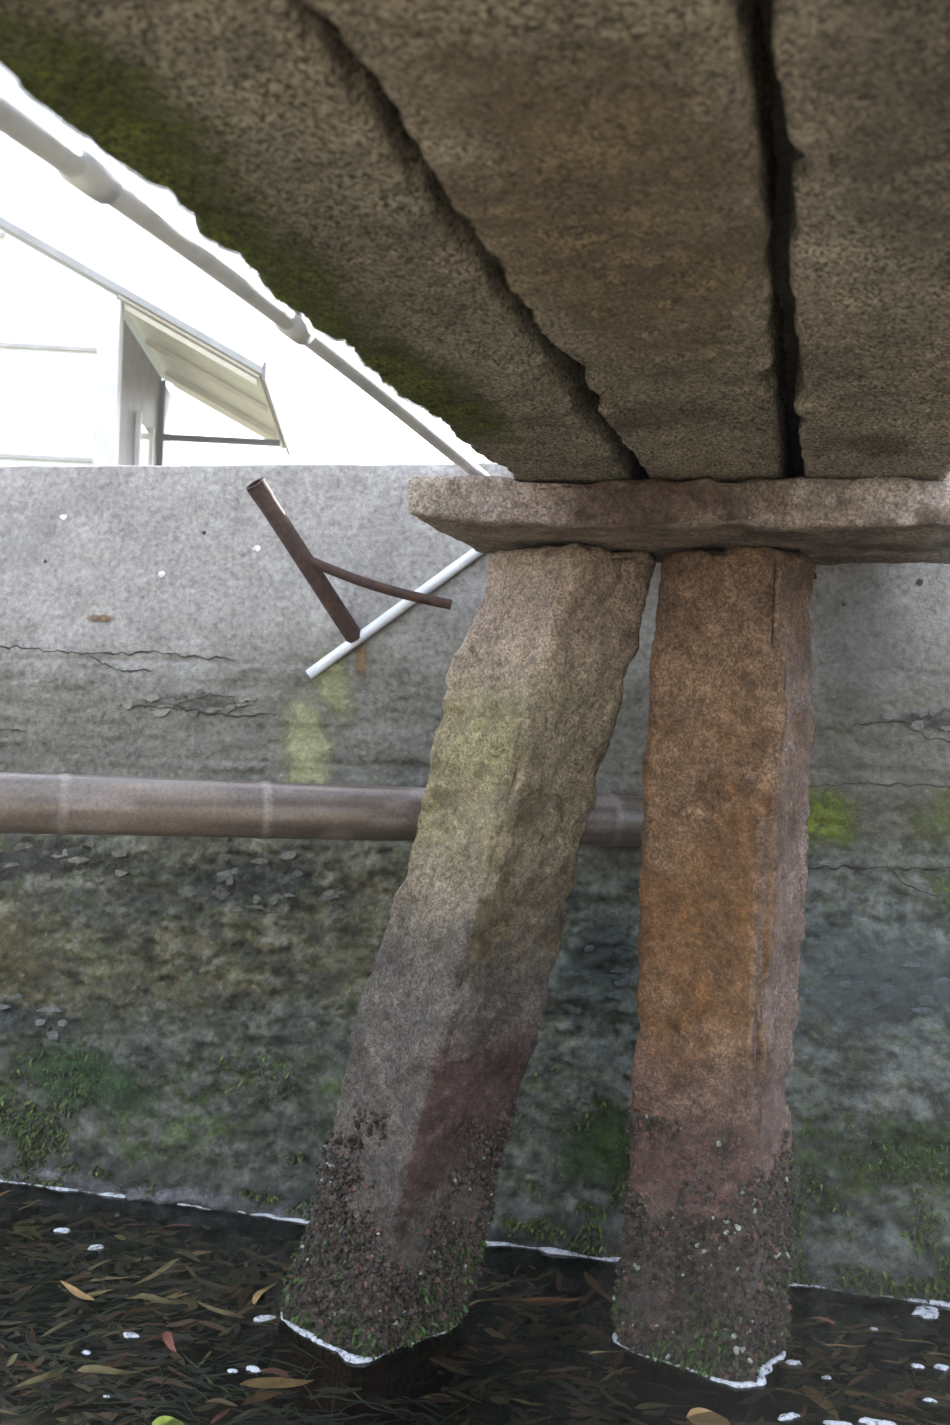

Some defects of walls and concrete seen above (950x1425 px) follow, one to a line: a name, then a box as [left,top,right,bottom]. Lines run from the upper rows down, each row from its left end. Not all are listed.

crack [849,721,950,743]
crack [807,781,950,789]